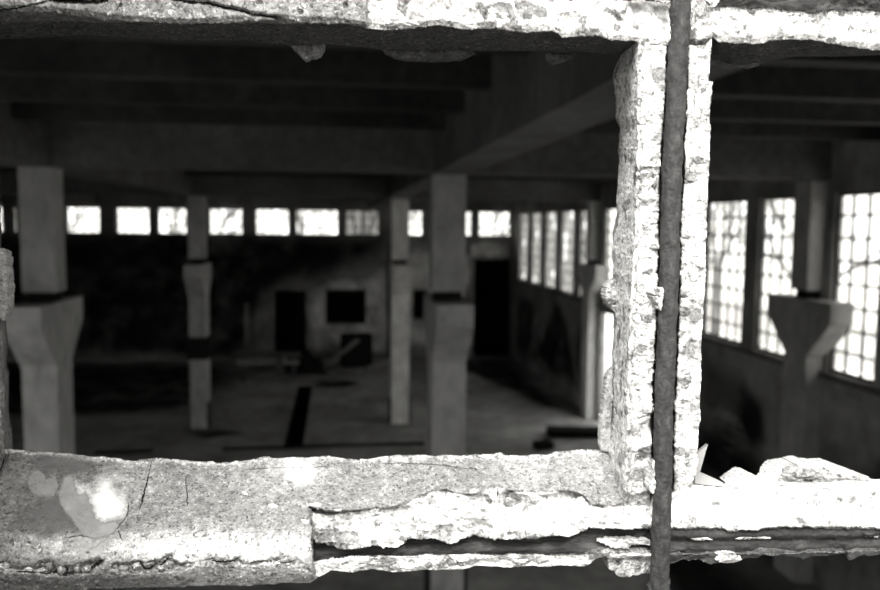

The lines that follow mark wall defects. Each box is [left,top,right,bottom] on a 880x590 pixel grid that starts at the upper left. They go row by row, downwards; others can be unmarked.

crack [0,0,121,11]
crack [175,0,277,18]
spalling [309,0,671,577]
leakage [24,457,124,556]